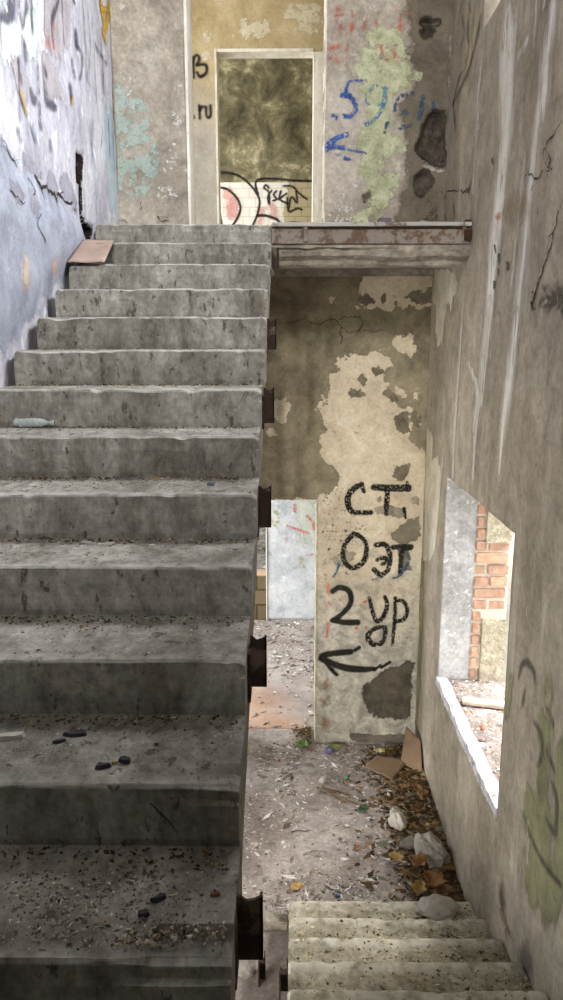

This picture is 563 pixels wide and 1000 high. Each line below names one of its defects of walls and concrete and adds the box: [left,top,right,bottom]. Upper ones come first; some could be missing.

peeling [1,0,72,106]
spalling [419,16,441,39]
peeling [114,67,178,202]
peeling [328,23,447,222]
peeling [11,183,40,218]
crack [2,136,77,241]
flaking render [75,152,93,239]
crack [524,122,561,318]
crack [293,310,382,345]
peeling [261,268,458,723]